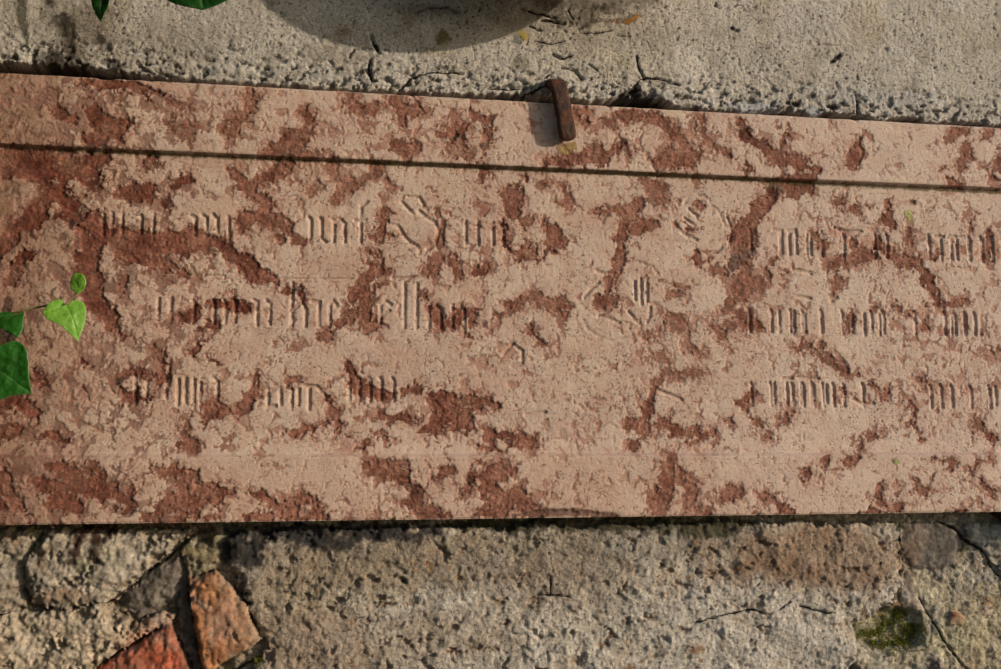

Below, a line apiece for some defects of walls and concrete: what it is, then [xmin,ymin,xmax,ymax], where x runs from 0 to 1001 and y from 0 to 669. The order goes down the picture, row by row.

crack [349,37,379,83]
crack [398,72,460,93]
crack [490,9,679,101]
crack [939,522,999,577]
crack [918,598,967,669]